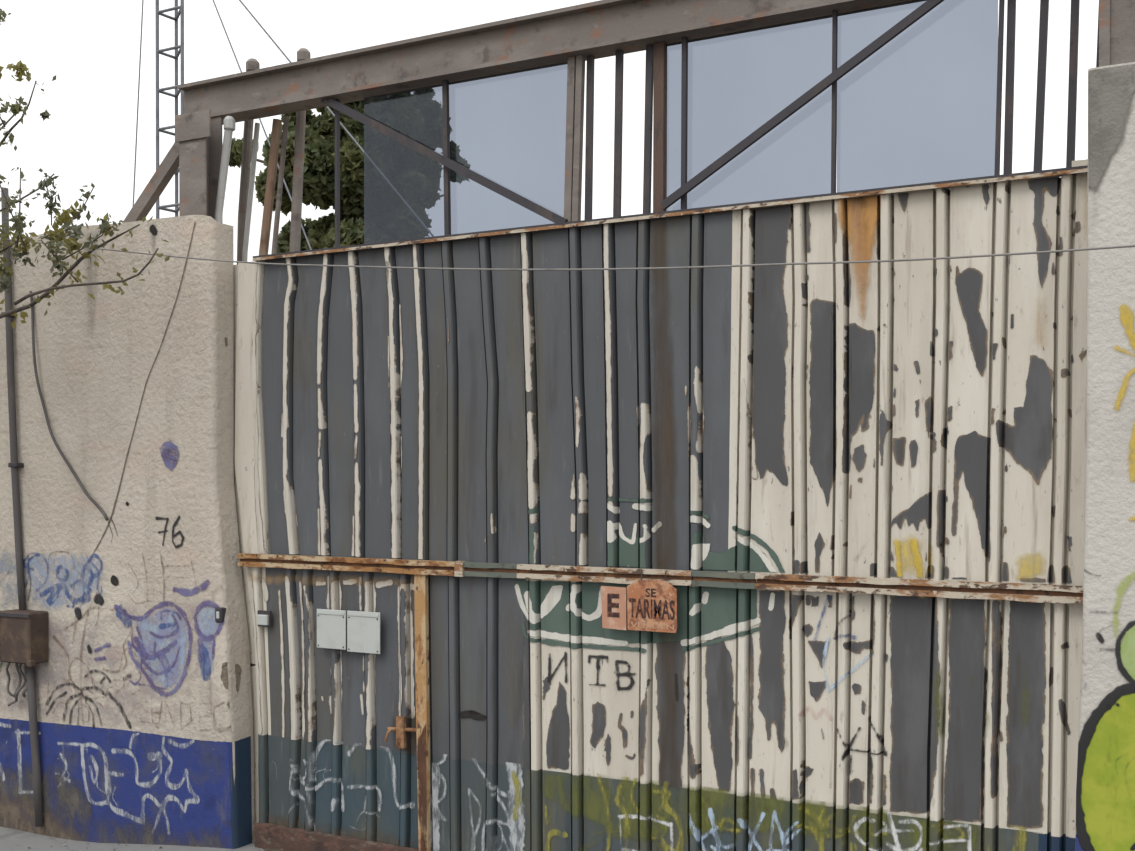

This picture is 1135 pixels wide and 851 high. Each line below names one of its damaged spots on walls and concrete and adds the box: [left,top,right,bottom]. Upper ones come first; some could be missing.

peeling [317,253,331,555]
peeling [348,251,361,557]
peeling [384,247,403,558]
peeling [413,244,424,559]
peeling [603,223,615,507]
rust [839,196,880,294]
peeling [736,193,1087,583]
peeling [1028,177,1080,287]
peeling [1088,64,1135,190]
rust [405,720,427,851]
peeling [590,590,832,800]
peeling [843,595,1071,828]